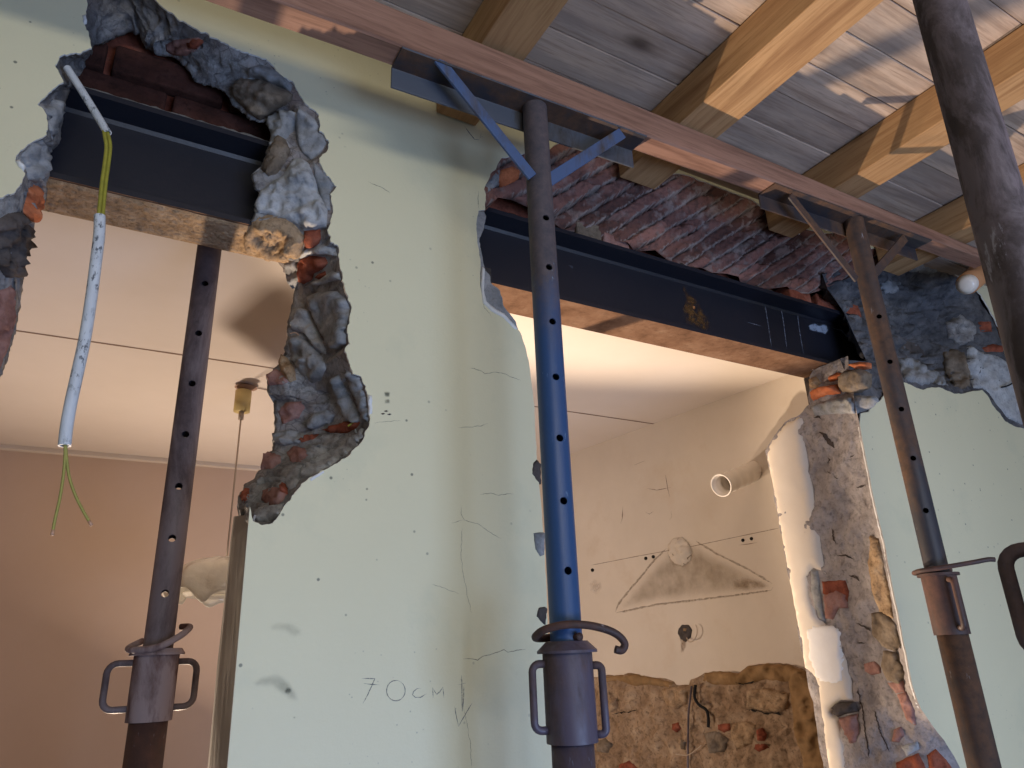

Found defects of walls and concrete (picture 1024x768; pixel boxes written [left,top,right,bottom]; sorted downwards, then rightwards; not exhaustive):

spalling [0,0,372,525]
flaking render [476,153,528,329]
flaking render [550,144,883,399]
spalling [871,249,1024,428]
flaking render [594,663,824,768]